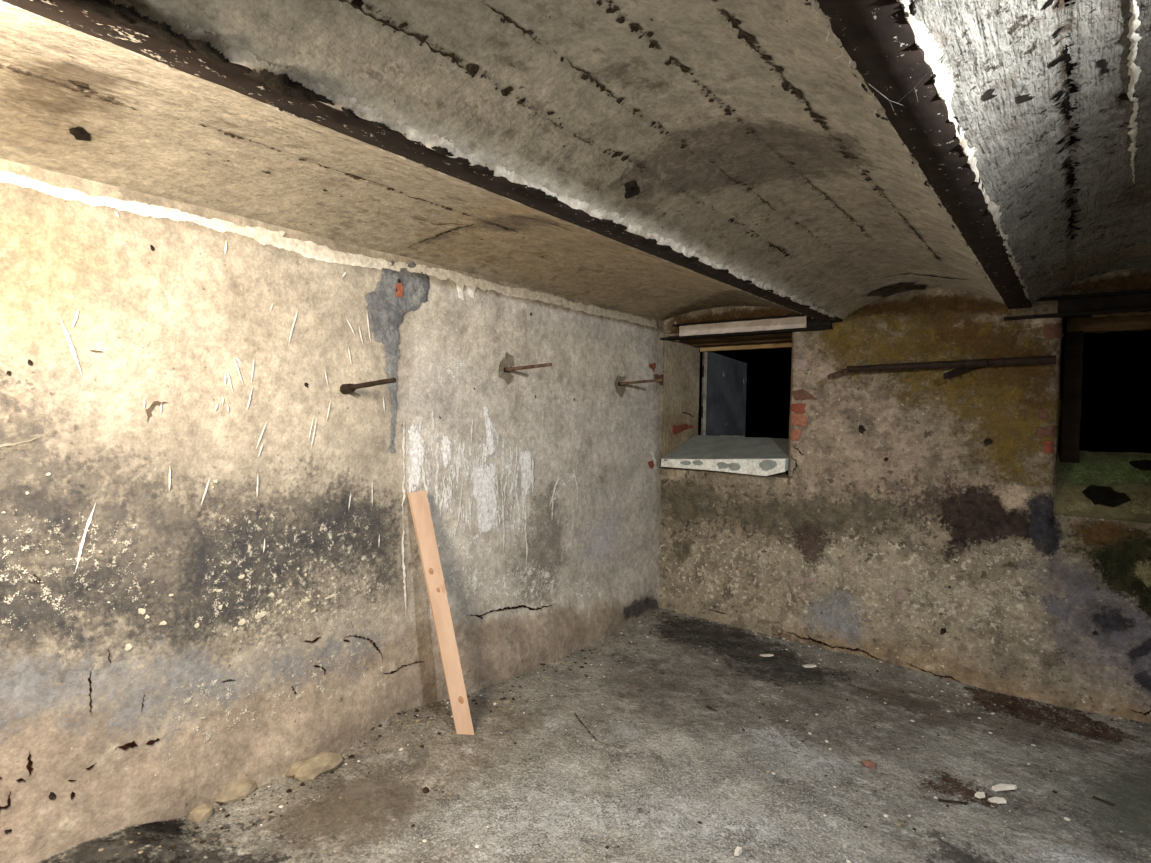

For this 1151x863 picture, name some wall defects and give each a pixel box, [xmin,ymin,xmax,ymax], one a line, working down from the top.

water stain [215,357,254,411]
water stain [660,295,1151,694]
water stain [0,370,411,731]
crack [464,603,556,619]
crack [0,751,33,809]
water stain [735,719,870,782]